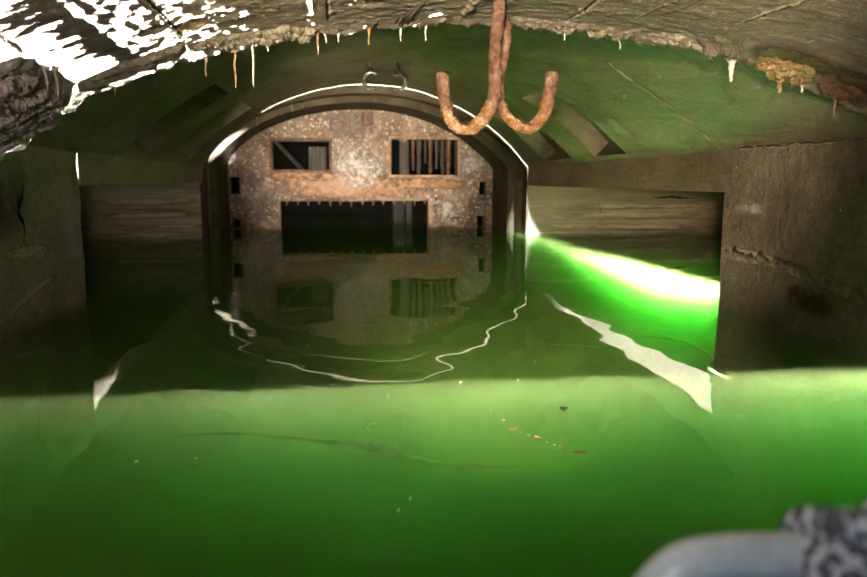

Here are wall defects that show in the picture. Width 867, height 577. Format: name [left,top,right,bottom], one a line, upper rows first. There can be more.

crack [139,0,185,39]
crack [325,0,334,21]
leakage [396,0,461,31]
crack [735,0,809,26]
crack [0,34,26,54]
leakage [186,23,350,53]
leakage [510,15,867,108]
rust [755,47,867,95]
spalling [0,18,206,162]
crack [609,62,842,151]
rust [272,173,464,199]